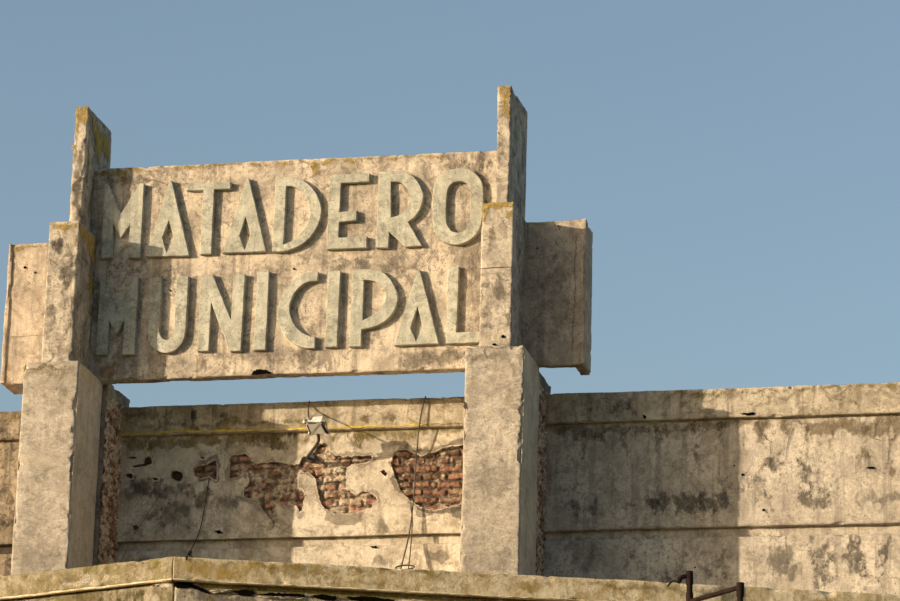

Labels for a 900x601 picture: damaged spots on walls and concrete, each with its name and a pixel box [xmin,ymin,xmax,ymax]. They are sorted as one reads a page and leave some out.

spalling [194,442,379,528]
spalling [381,438,463,520]
damp [645,485,729,515]
damp [770,545,797,580]
damp [809,535,866,587]